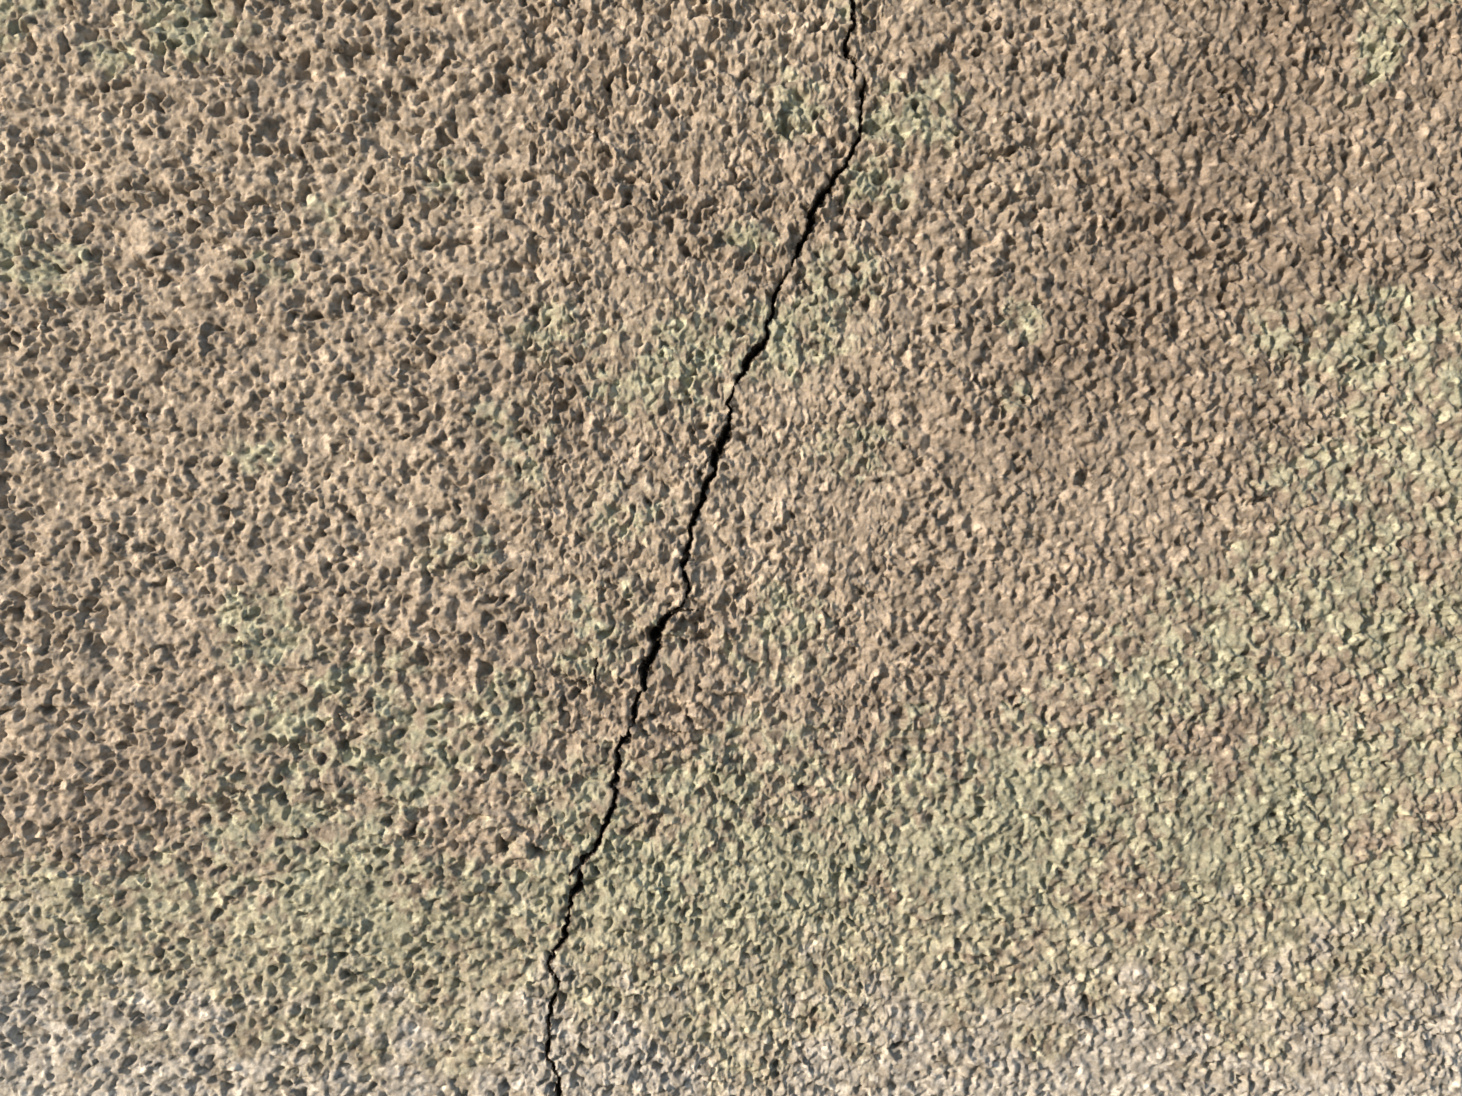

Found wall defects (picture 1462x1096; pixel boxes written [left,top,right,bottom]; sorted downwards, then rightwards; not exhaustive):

crack [544,0,867,1096]